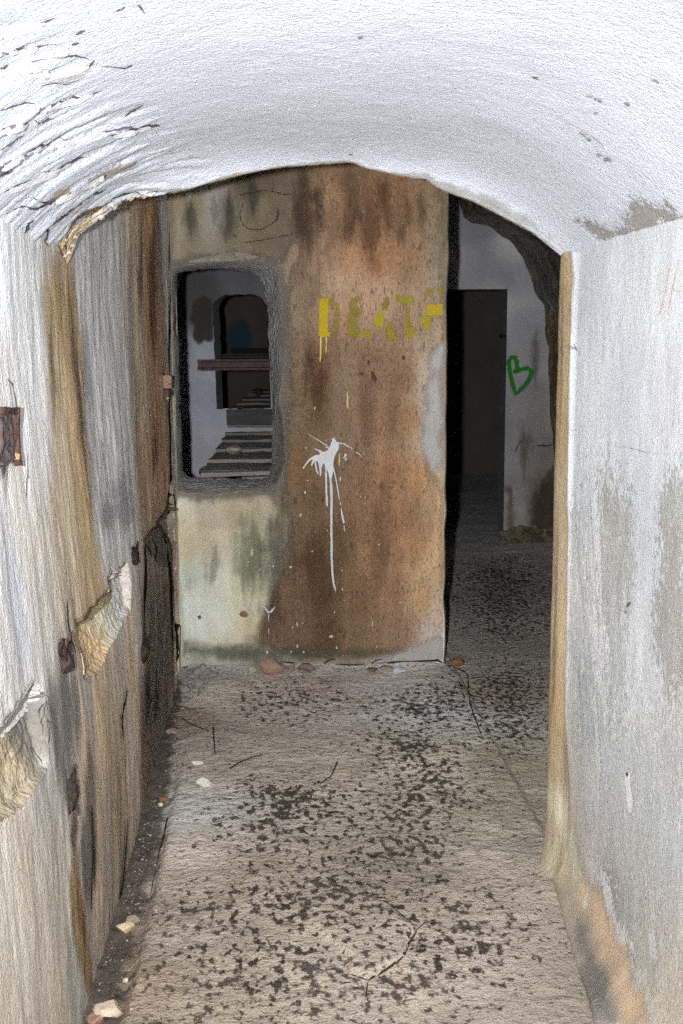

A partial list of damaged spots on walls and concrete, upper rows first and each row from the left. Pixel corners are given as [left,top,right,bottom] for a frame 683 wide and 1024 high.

peeling [0,18,159,171]
peeling [3,157,158,263]
peeling [573,194,683,241]
leakage [84,351,130,530]
corrosion [259,162,447,657]
spalling [74,561,132,679]
leakage [242,528,281,584]
spalling [0,680,49,822]
leakage [49,671,97,893]
leakage [112,553,556,1024]